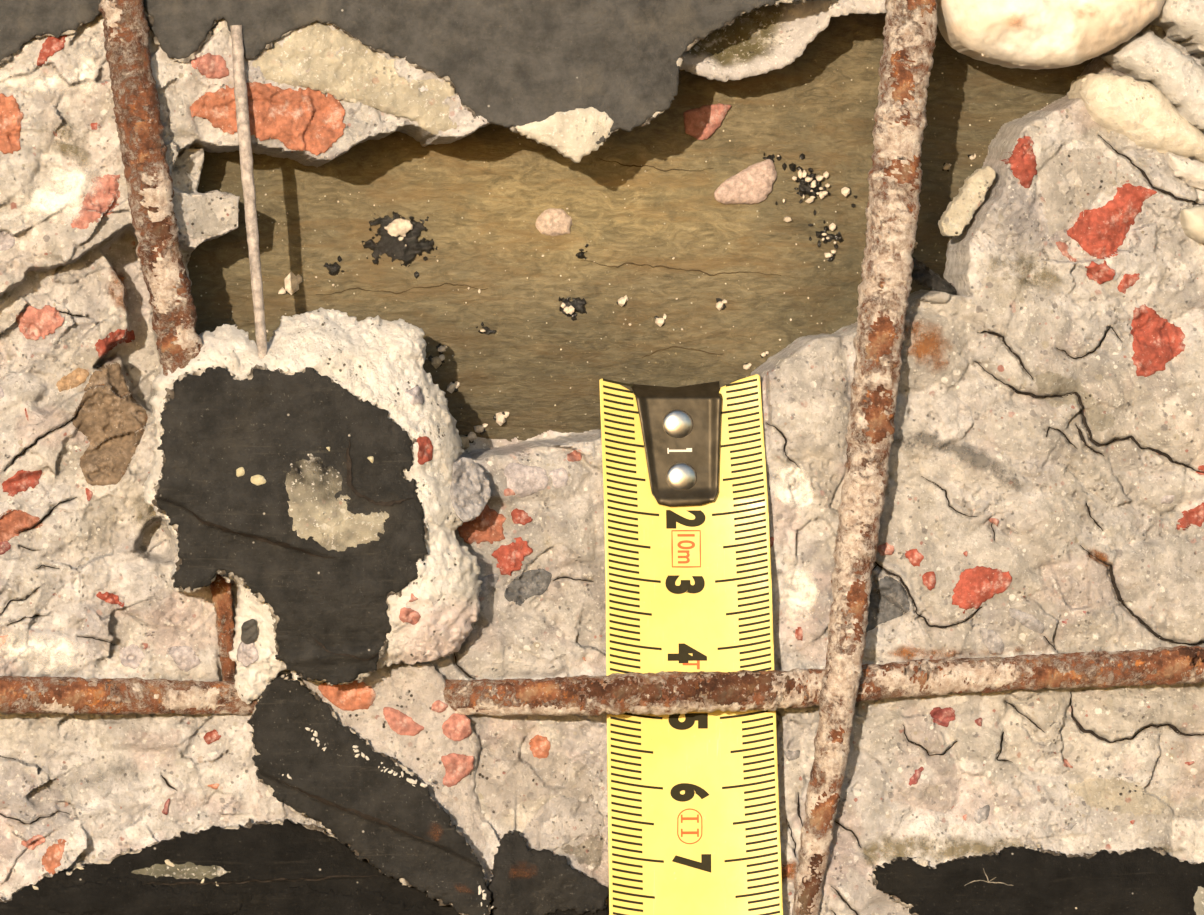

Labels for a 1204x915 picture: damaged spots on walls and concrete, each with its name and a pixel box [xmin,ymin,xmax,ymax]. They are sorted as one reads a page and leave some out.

peeling [0,0,100,65]
peeling [143,0,887,163]
spalling [181,195,239,241]
peeling [938,166,996,237]
crack [1098,135,1204,205]
rust [862,384,895,452]
crack [974,327,1204,473]
crack [1080,503,1204,646]
rust [0,678,114,714]
rust [485,672,805,707]
crack [1070,692,1204,743]
rust [782,854,825,915]